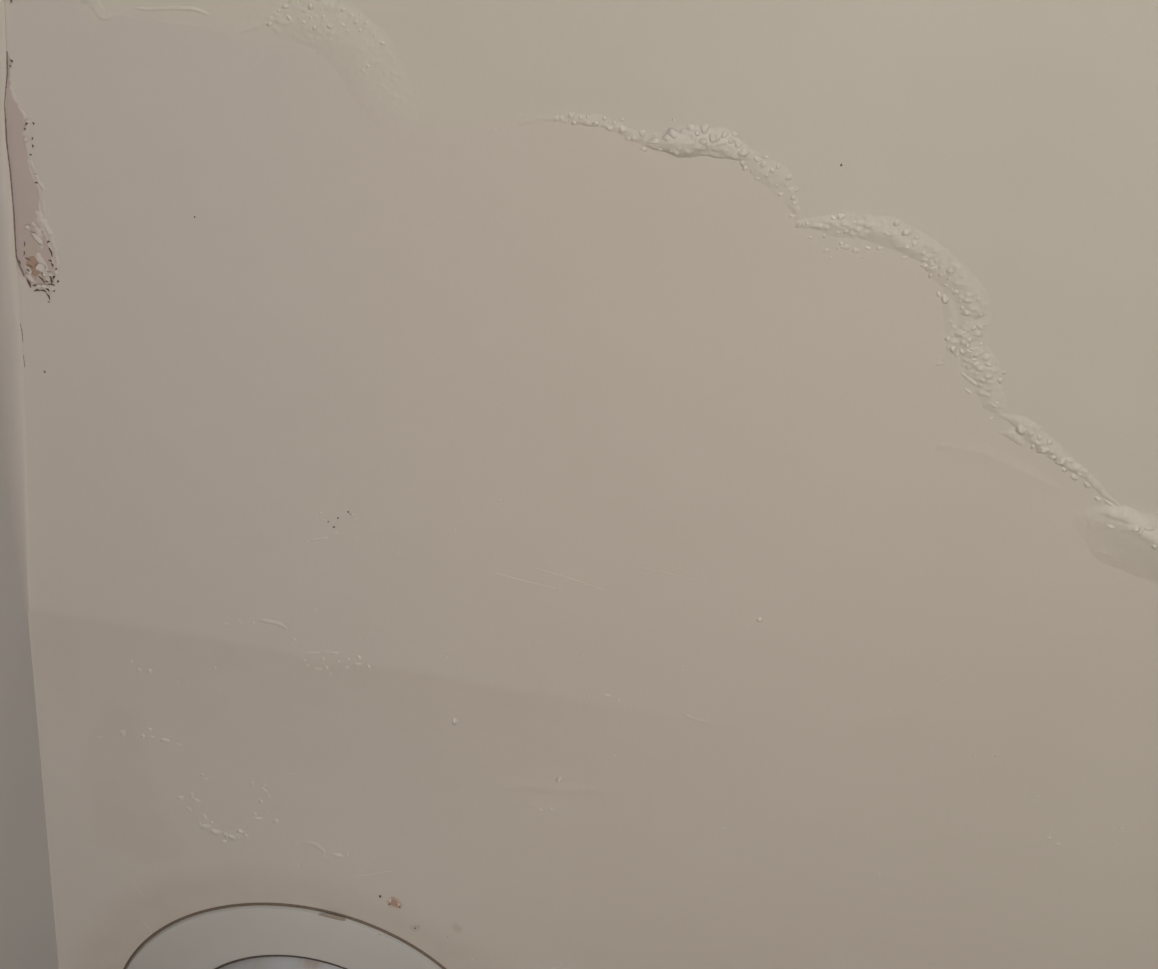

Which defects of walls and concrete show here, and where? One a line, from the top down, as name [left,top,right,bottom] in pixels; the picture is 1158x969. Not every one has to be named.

peeling [4,52,60,303]